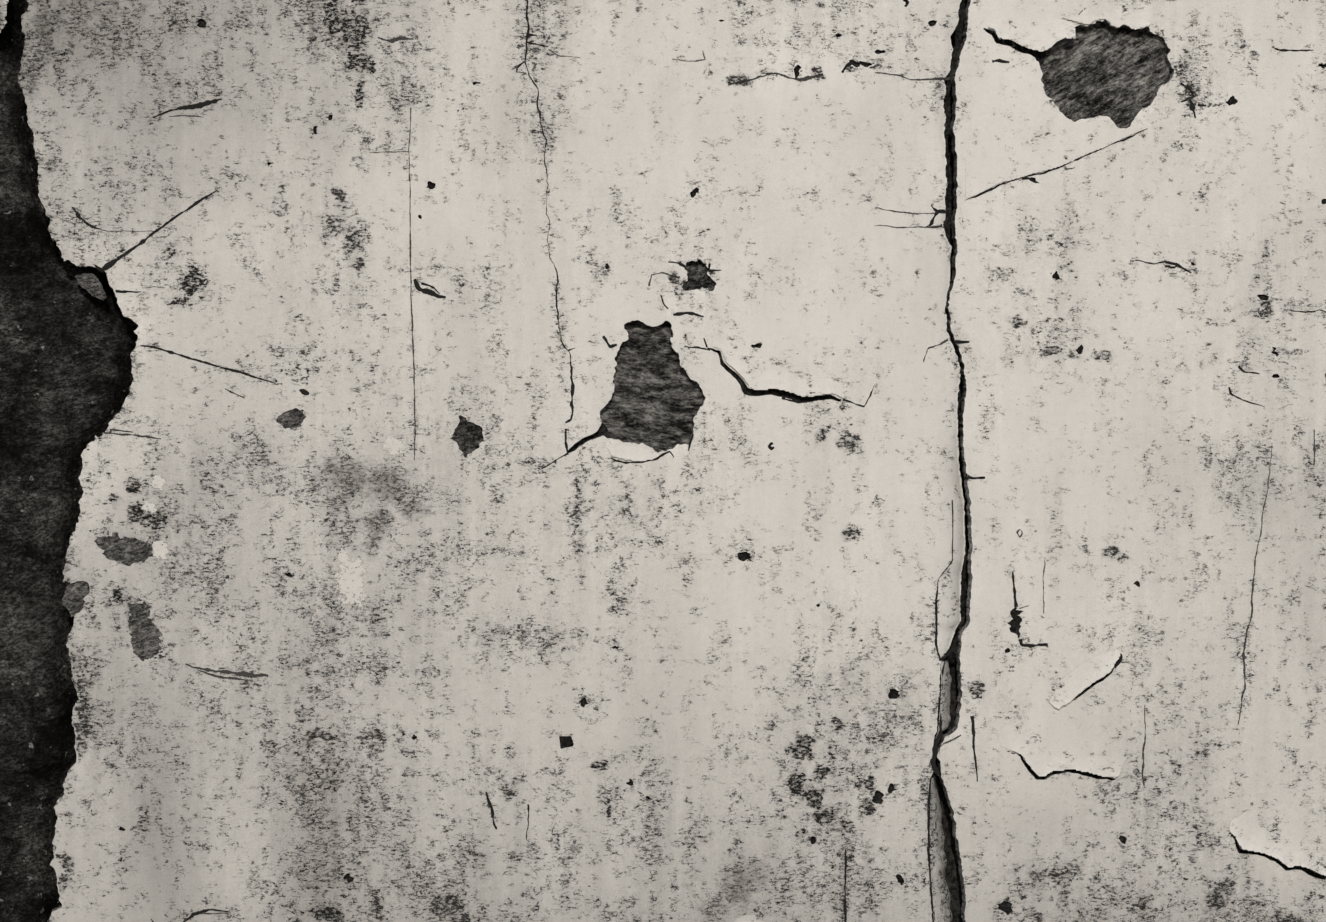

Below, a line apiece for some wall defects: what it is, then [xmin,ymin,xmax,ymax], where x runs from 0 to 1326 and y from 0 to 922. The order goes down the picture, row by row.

spalling [985,10,1206,128]
spalling [600,260,721,464]
crack [685,338,874,407]
crack [728,0,1148,922]
spalling [62,581,90,617]
spalling [94,532,153,566]
peeling [996,649,1126,780]
peeling [1229,805,1326,879]